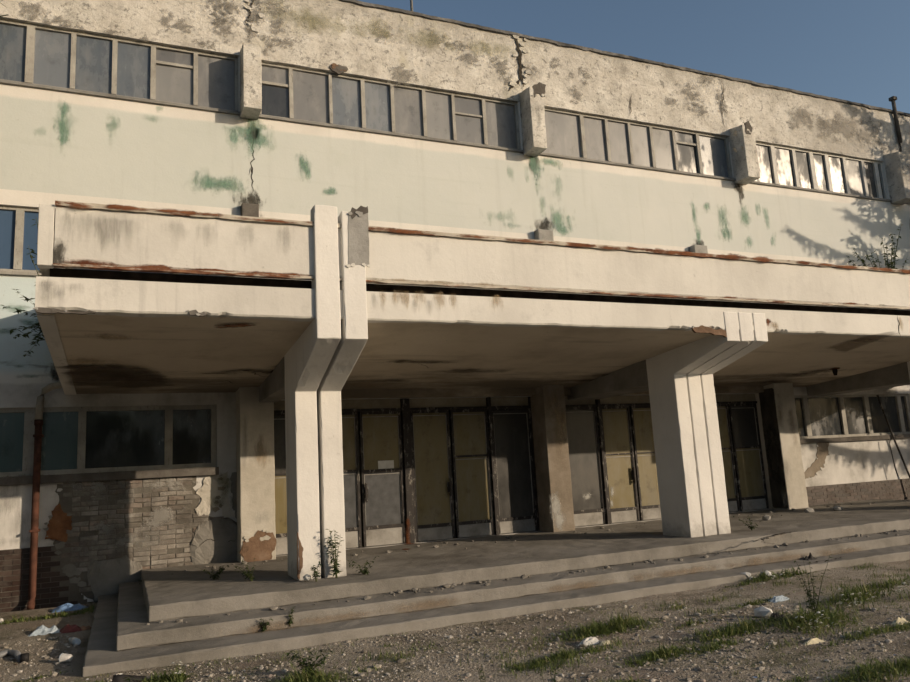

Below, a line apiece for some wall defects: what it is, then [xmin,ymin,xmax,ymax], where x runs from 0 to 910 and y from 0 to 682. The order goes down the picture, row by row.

crack [245,0,265,39]
crack [508,35,531,91]
crack [248,120,256,191]
rust [107,204,221,217]
rust [572,244,694,255]
rust [726,253,772,262]
leakage [51,365,165,388]
spalling [804,442,831,479]
flaking render [43,471,237,603]
spalling [240,529,277,562]